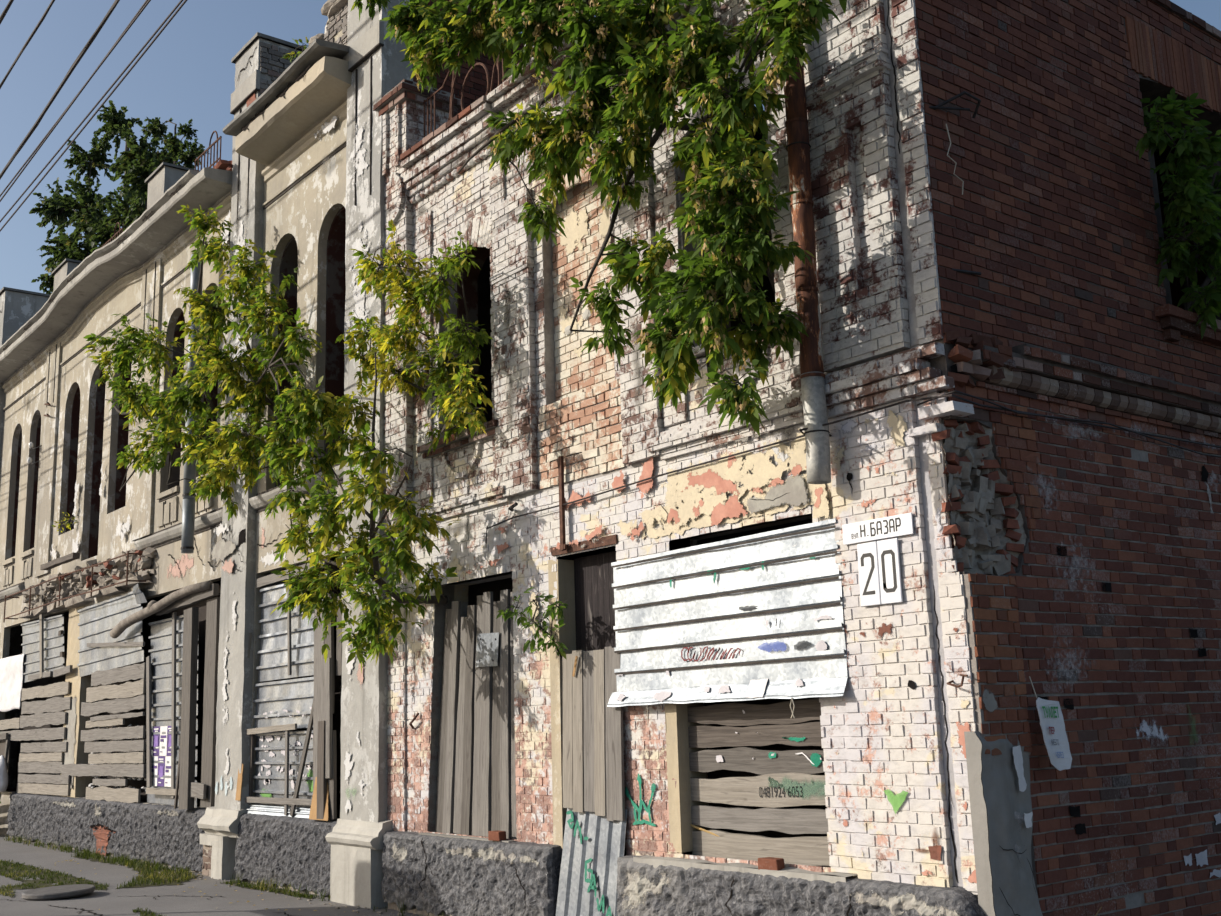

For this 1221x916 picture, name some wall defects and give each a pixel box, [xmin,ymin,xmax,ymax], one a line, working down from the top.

crack [887,4,901,154]
crack [168,533,282,578]
spalling [931,419,1026,576]
peeling [221,592,237,725]
crack [933,585,958,883]